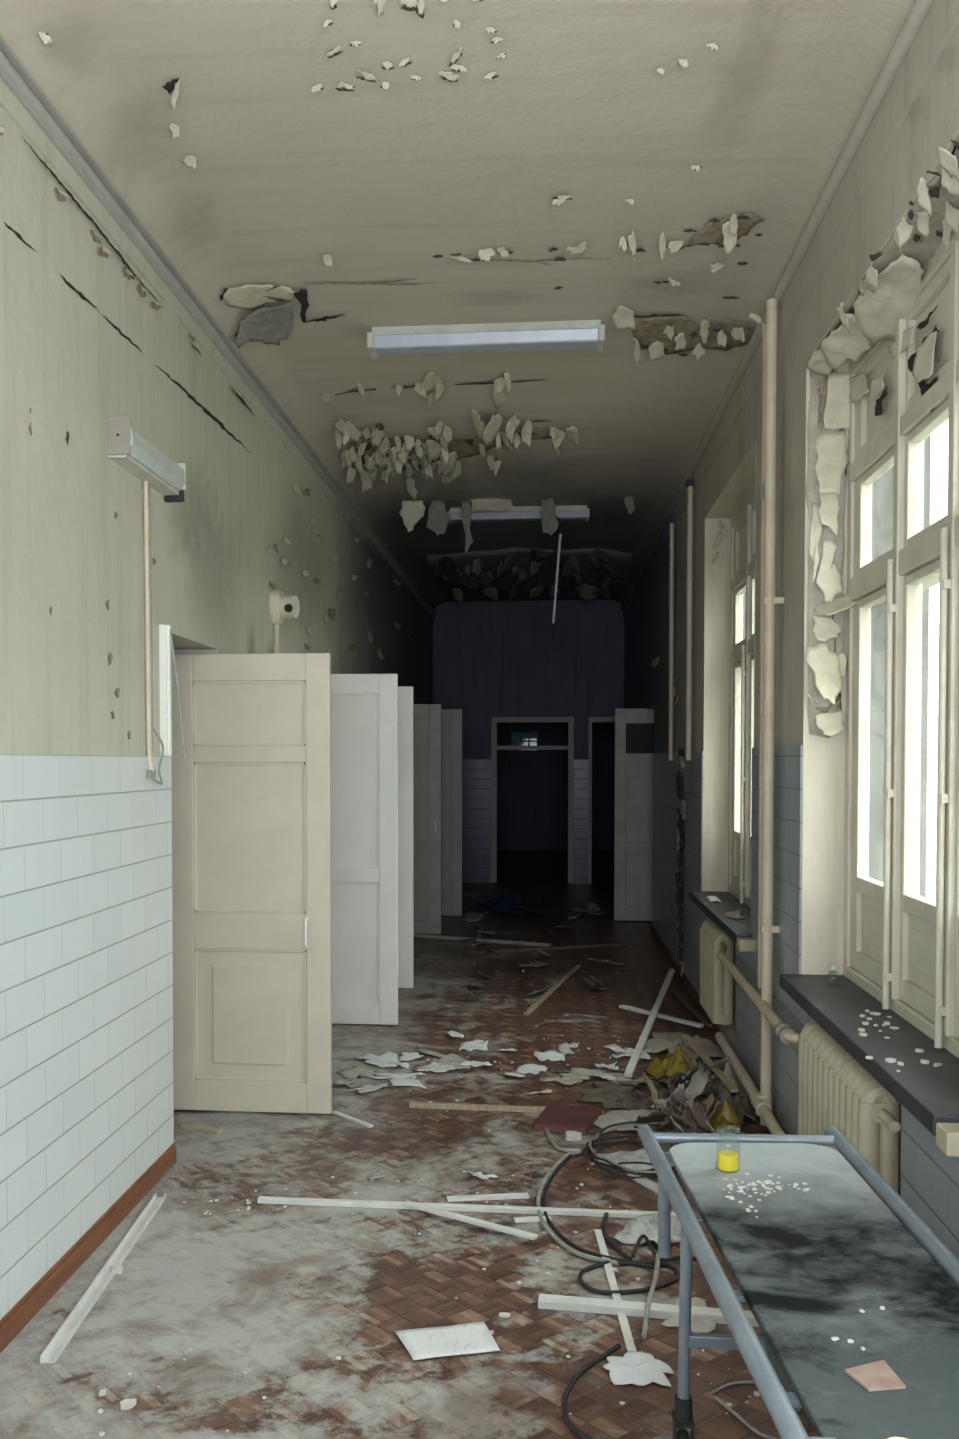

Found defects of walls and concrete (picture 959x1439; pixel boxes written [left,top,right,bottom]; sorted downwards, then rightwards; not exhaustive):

peeling [373,0,455,18]
peeling [311,47,467,93]
peeling [483,27,507,81]
crack [22,137,164,309]
peeling [433,247,513,264]
peeling [549,242,588,261]
peeling [619,213,765,274]
crack [4,222,255,453]
flaking render [220,284,309,348]
peeling [612,305,756,369]
peeling [805,138,959,738]
peeling [320,371,635,604]